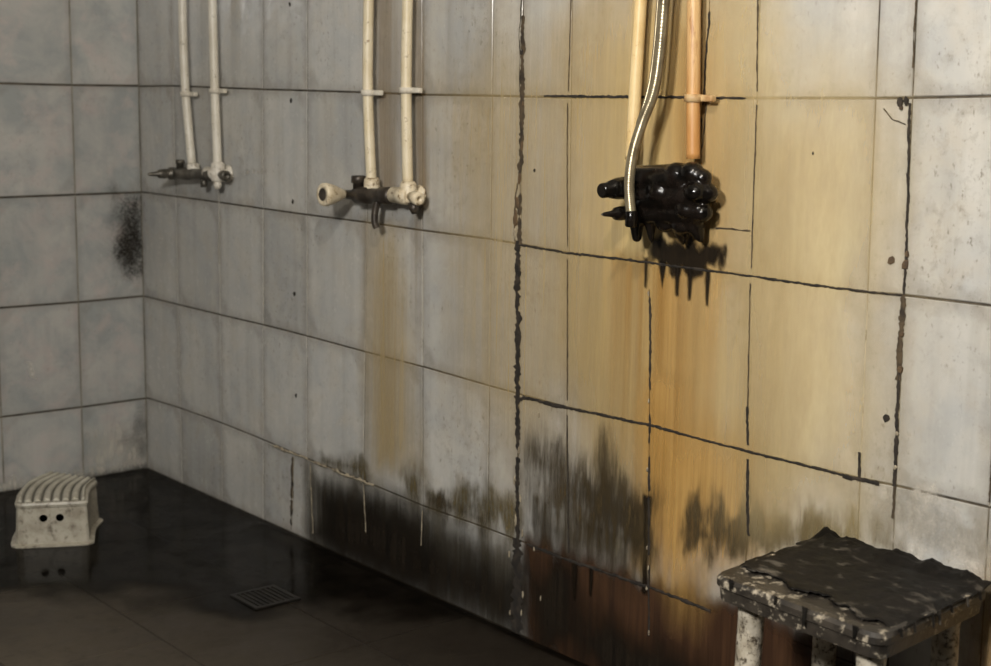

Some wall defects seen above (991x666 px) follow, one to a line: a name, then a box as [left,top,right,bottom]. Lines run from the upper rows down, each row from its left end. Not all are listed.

crack [910,0,918,68]
damp [117,203,142,271]
crack [508,0,567,636]
corrosion [579,0,742,569]
corrosion [752,43,859,484]
crack [842,96,911,519]
damp [327,456,366,532]
damp [406,474,521,545]
damp [528,437,651,594]